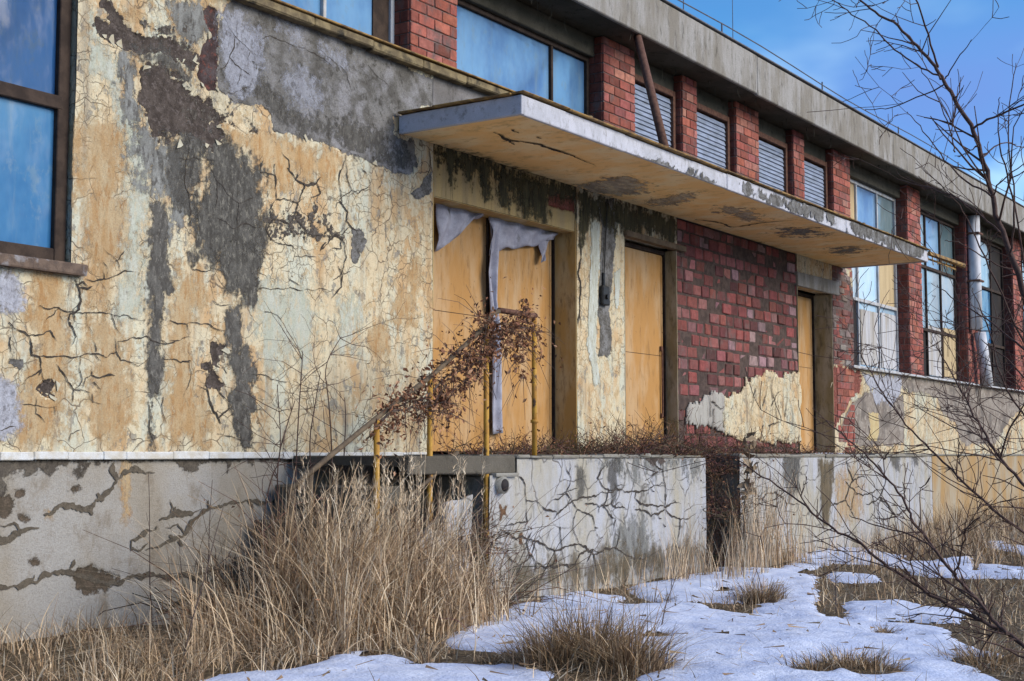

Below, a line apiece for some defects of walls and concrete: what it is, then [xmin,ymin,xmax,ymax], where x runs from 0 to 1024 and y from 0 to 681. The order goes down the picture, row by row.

peeling [93,0,433,199]
crack [493,130,596,166]
damp [0,0,413,497]
crack [182,133,371,321]
spalling [263,202,367,264]
damp [432,141,678,386]
crack [0,251,248,447]
peeling [685,370,802,446]
peeling [830,364,1024,447]
crack [499,459,695,575]
damp [577,458,701,503]
damp [818,458,834,527]